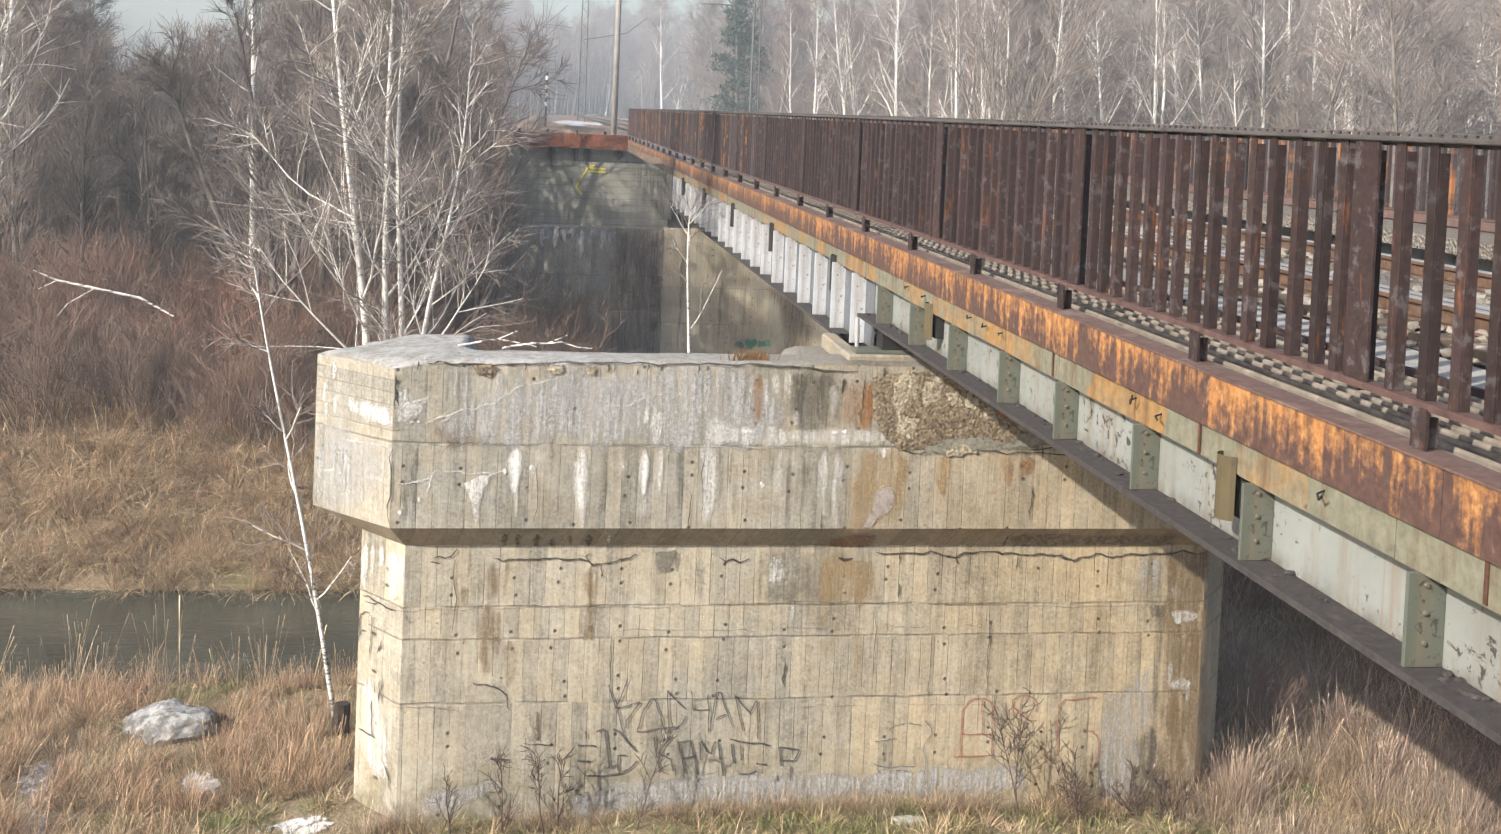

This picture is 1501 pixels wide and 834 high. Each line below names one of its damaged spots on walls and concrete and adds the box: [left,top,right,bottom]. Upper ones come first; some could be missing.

damp [448,368,906,526]
spalling [871,369,1020,458]
crack [430,548,465,644]
crack [494,462,637,578]
crack [820,446,1205,694]